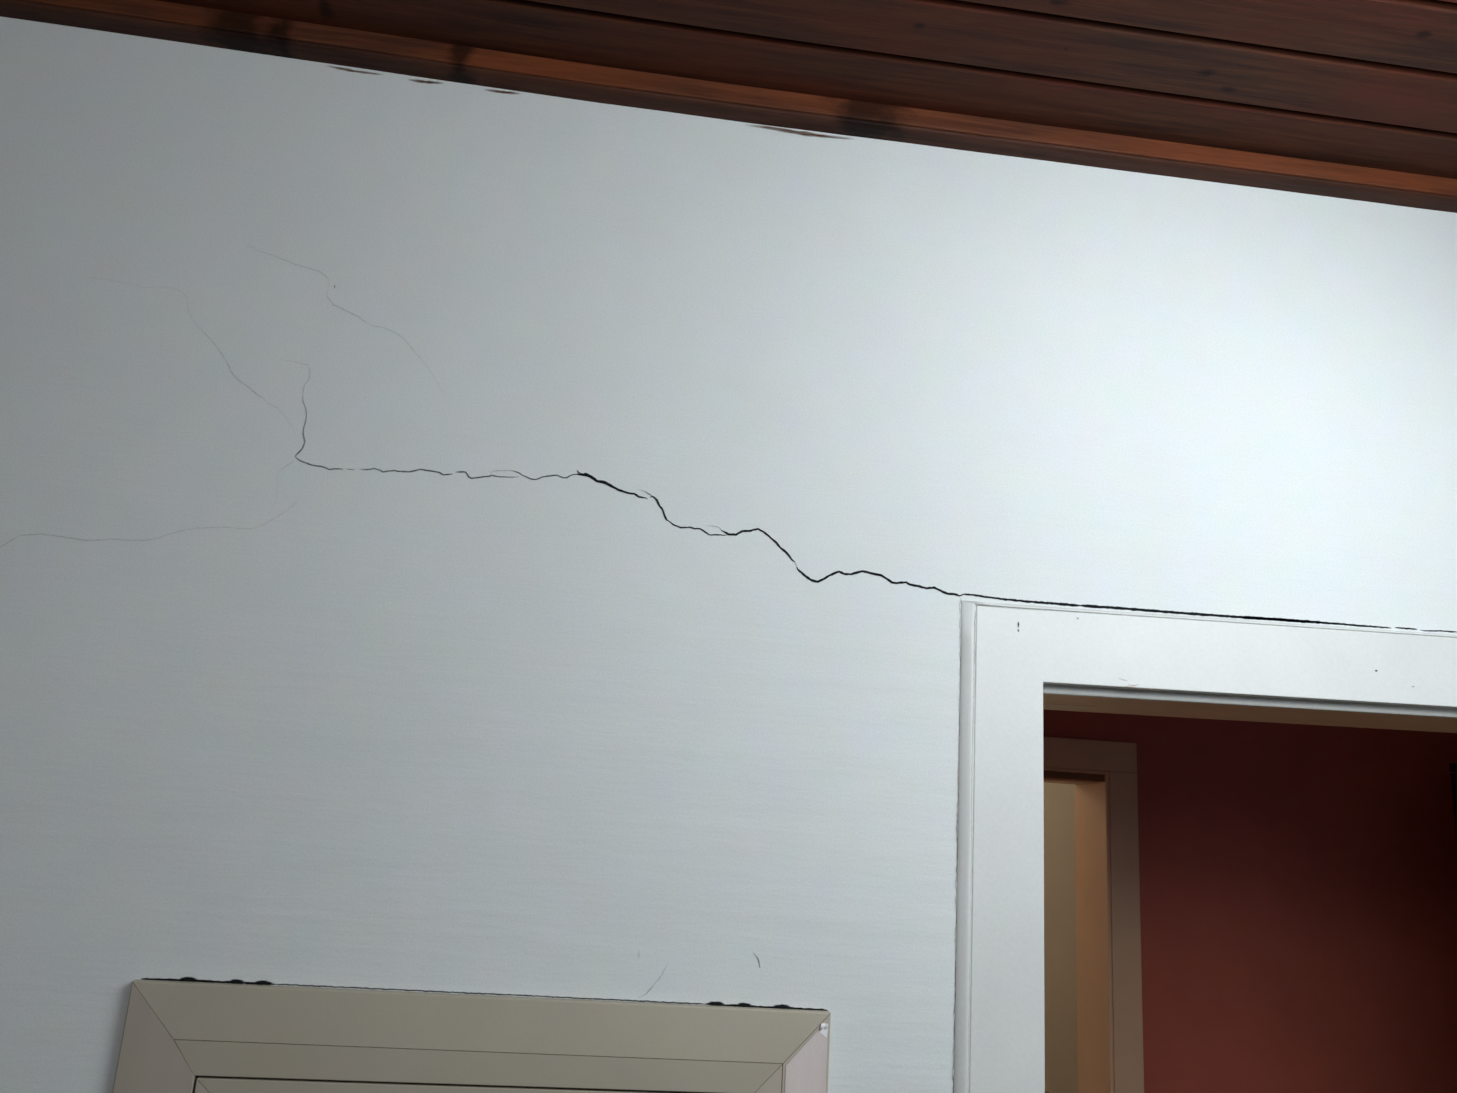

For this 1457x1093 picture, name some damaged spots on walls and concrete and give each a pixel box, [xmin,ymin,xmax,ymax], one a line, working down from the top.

crack [295,424,1456,632]